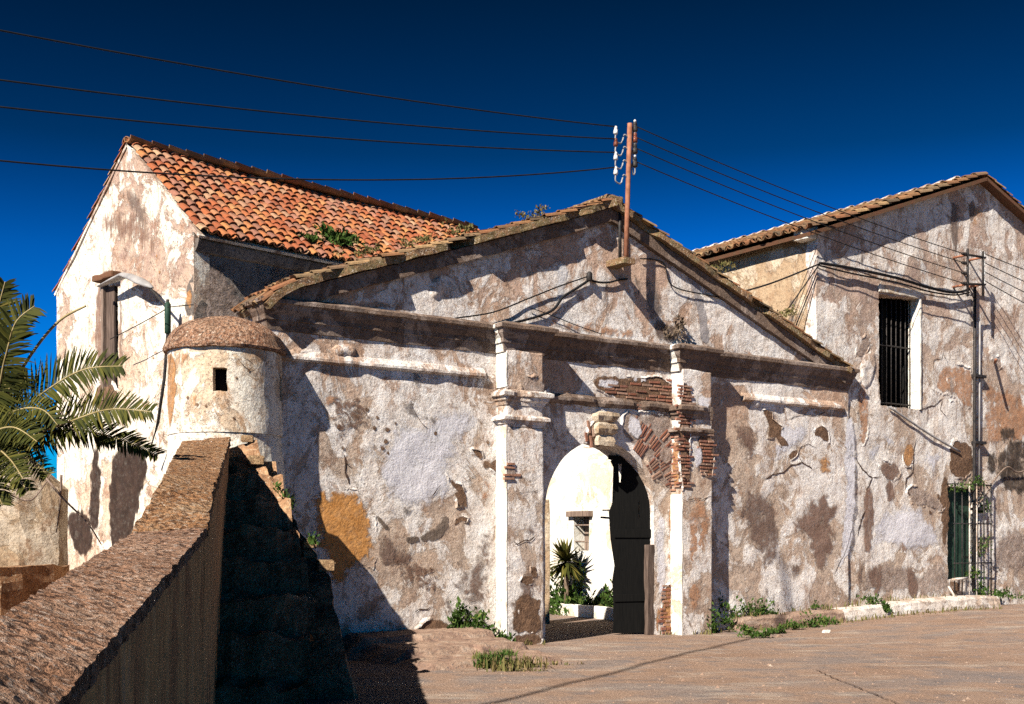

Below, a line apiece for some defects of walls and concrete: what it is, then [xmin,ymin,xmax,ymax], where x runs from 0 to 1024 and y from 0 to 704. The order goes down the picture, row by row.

flaking render [309,487,378,594]
peeling [329,391,521,525]
flaking render [593,375,719,492]
flaking render [656,517,671,634]
water stain [741,490,778,567]
crack [764,444,816,480]
spalling [762,408,830,461]
water stain [795,494,837,569]
crack [834,458,881,574]
peeling [839,378,973,567]